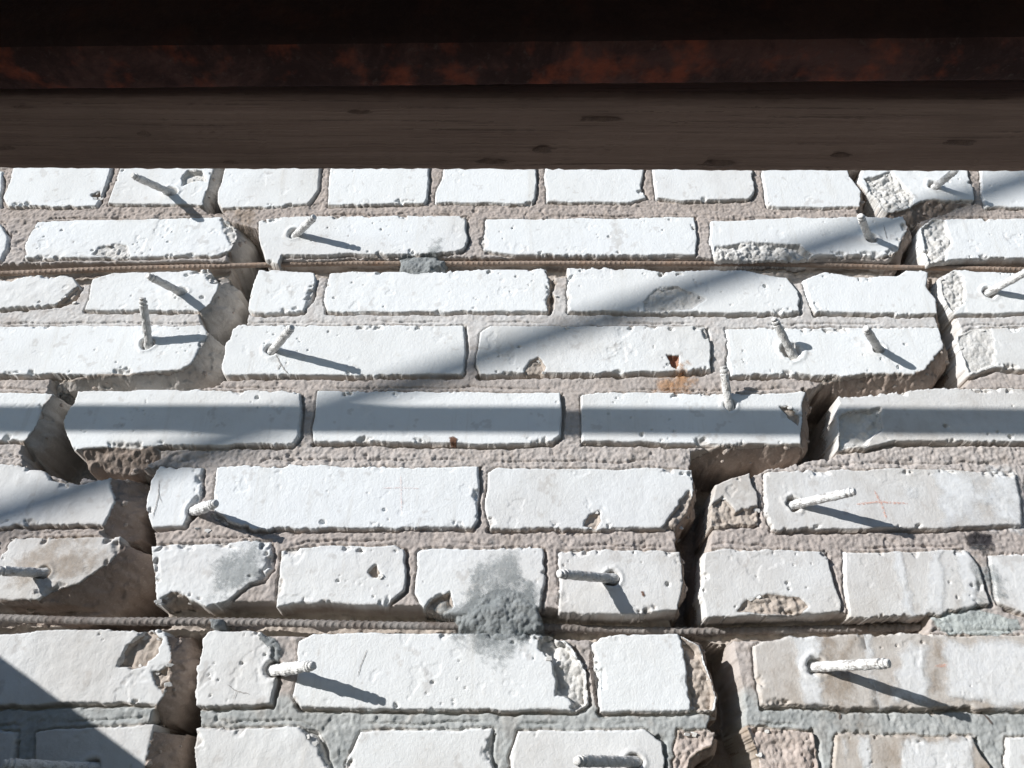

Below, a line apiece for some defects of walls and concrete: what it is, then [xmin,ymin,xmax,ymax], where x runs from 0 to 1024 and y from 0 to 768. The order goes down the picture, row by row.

crack [847,170,867,214]
spalling [865,172,913,217]
spalling [0,244,401,284]
spalling [445,219,1024,315]
crack [1,168,268,768]
crack [671,200,967,768]
spalling [0,592,459,694]
leakage [432,555,554,659]
spalling [536,594,922,712]